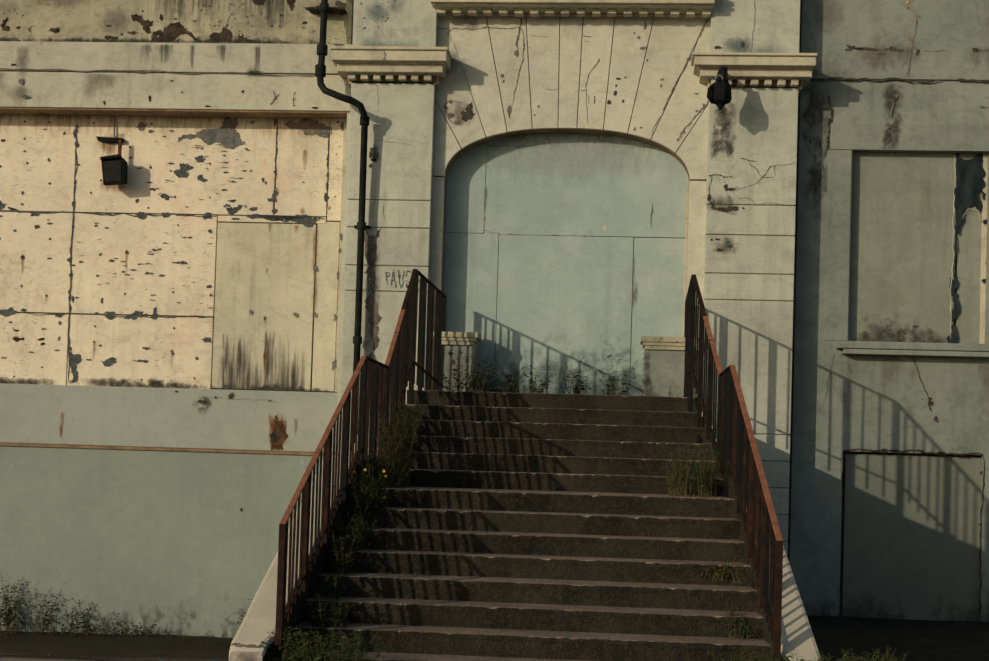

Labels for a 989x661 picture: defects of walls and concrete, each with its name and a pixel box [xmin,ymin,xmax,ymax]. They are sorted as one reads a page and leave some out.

flaking render [104,0,320,43]
damp [713,104,733,154]
damp [884,85,898,142]
crack [811,17,989,171]
peeling [136,107,344,227]
crack [708,158,789,206]
peeling [0,124,216,383]
flaking render [364,228,382,360]
peeling [947,234,960,343]
damp [223,344,318,392]
crack [914,359,939,422]
rust [270,415,288,450]